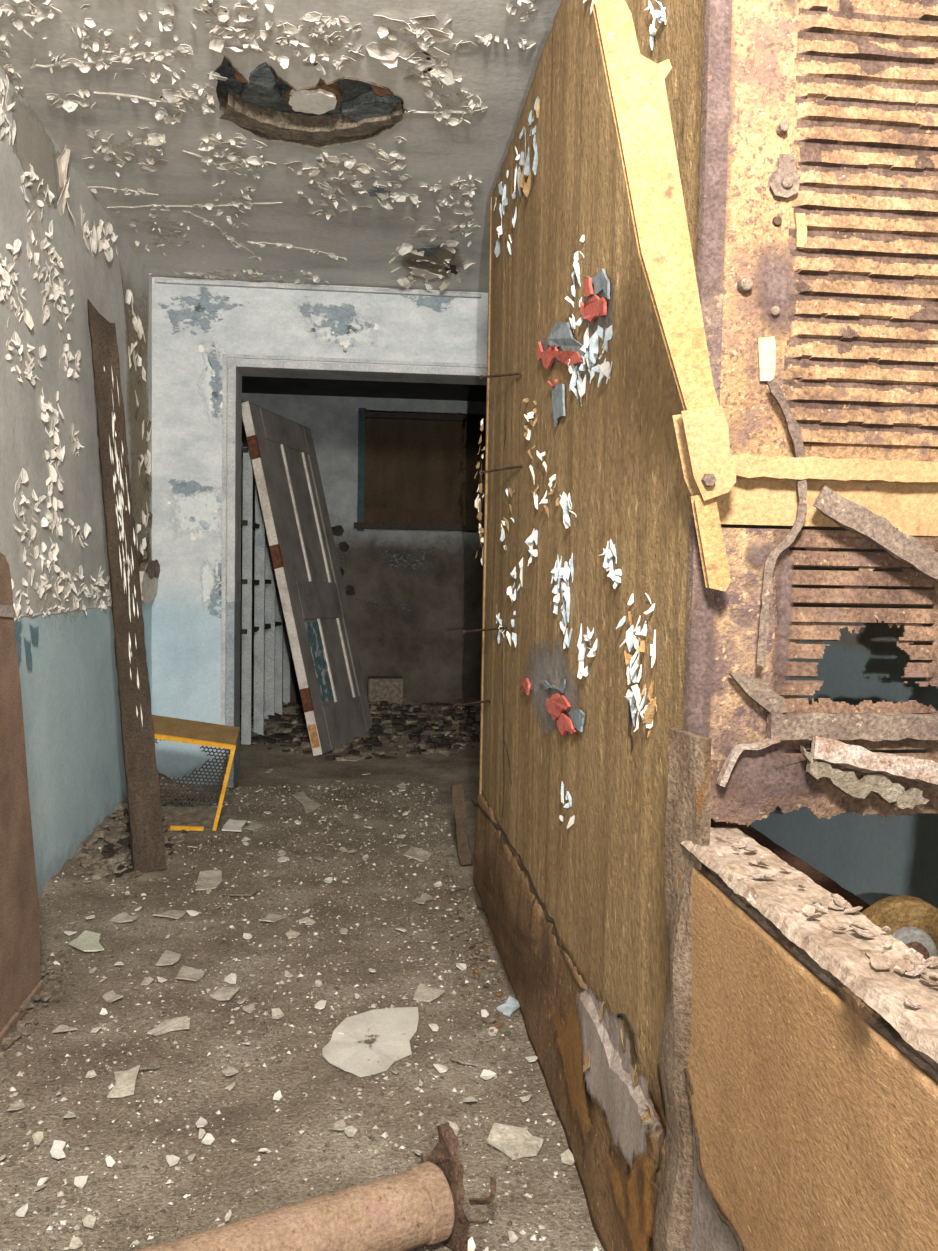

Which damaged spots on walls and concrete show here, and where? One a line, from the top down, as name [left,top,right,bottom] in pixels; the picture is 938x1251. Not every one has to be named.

rust [700,0,733,289]
spalling [0,0,540,687]
peeling [537,235,613,426]
rust [748,541,771,565]
crack [471,642,585,991]
peeling [519,553,597,736]
crack [626,702,634,752]
peeling [616,593,657,738]
rust [687,592,716,736]
rust [729,736,938,797]
peeling [577,987,659,1167]
rust [842,988,871,1038]